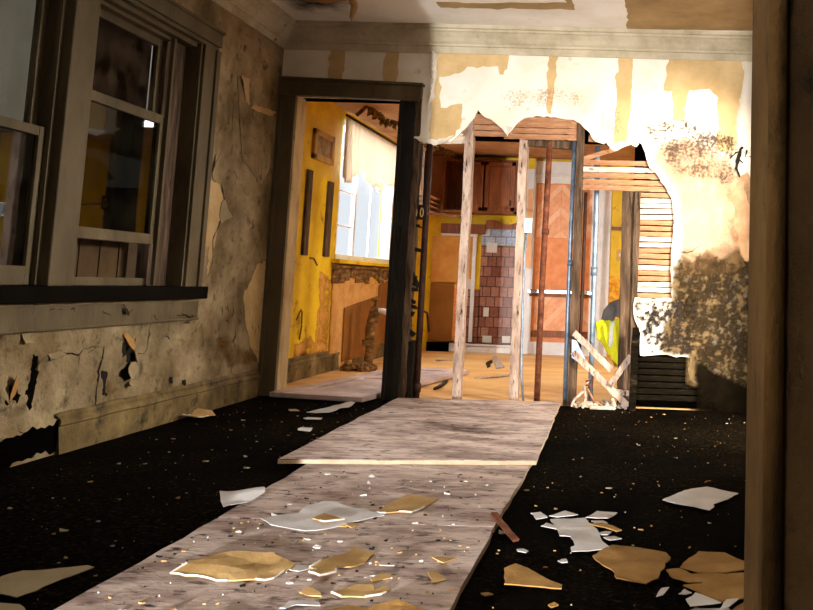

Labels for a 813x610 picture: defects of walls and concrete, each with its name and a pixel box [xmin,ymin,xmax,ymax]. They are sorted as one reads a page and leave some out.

flaking render [436,0,575,10]
flaking render [625,0,753,31]
flaking render [415,53,509,145]
flaking render [546,56,558,114]
flaking render [605,58,633,151]
flaking render [664,59,744,152]
crack [730,146,751,177]
peeling [205,153,232,274]
leakage [635,119,749,388]
peeling [243,260,266,363]
crack [49,341,104,405]
spalling [0,420,59,471]